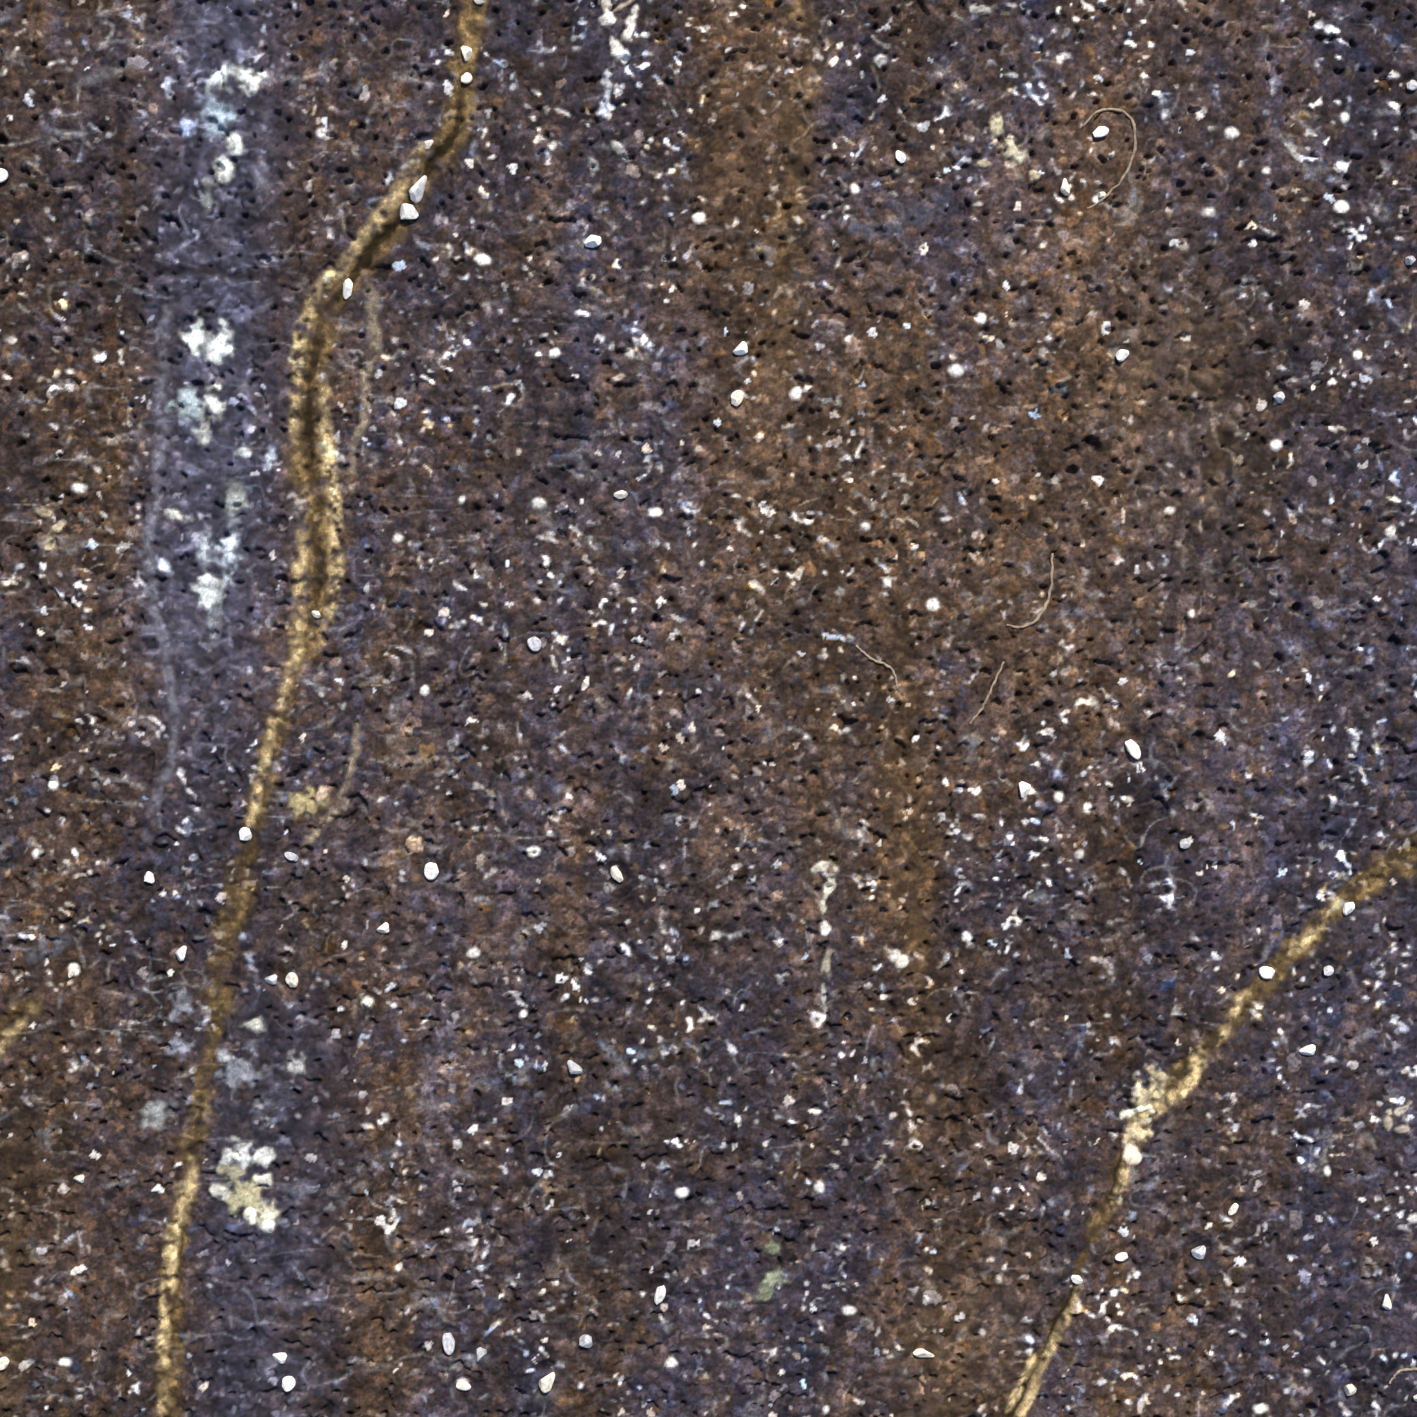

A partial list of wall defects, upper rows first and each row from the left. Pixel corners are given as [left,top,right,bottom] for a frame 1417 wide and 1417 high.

water stain [144,0,275,806]
crack [156,0,487,1417]
crack [0,1001,41,1057]
water stain [166,1038,191,1054]
water stain [169,989,192,1021]
water stain [215,1050,261,1089]
water stain [245,1019,265,1031]
water stain [141,1101,175,1128]
water stain [264,1048,311,1156]
crack [1006,833,1417,1417]
water stain [234,1224,314,1285]
water stain [262,1356,309,1384]